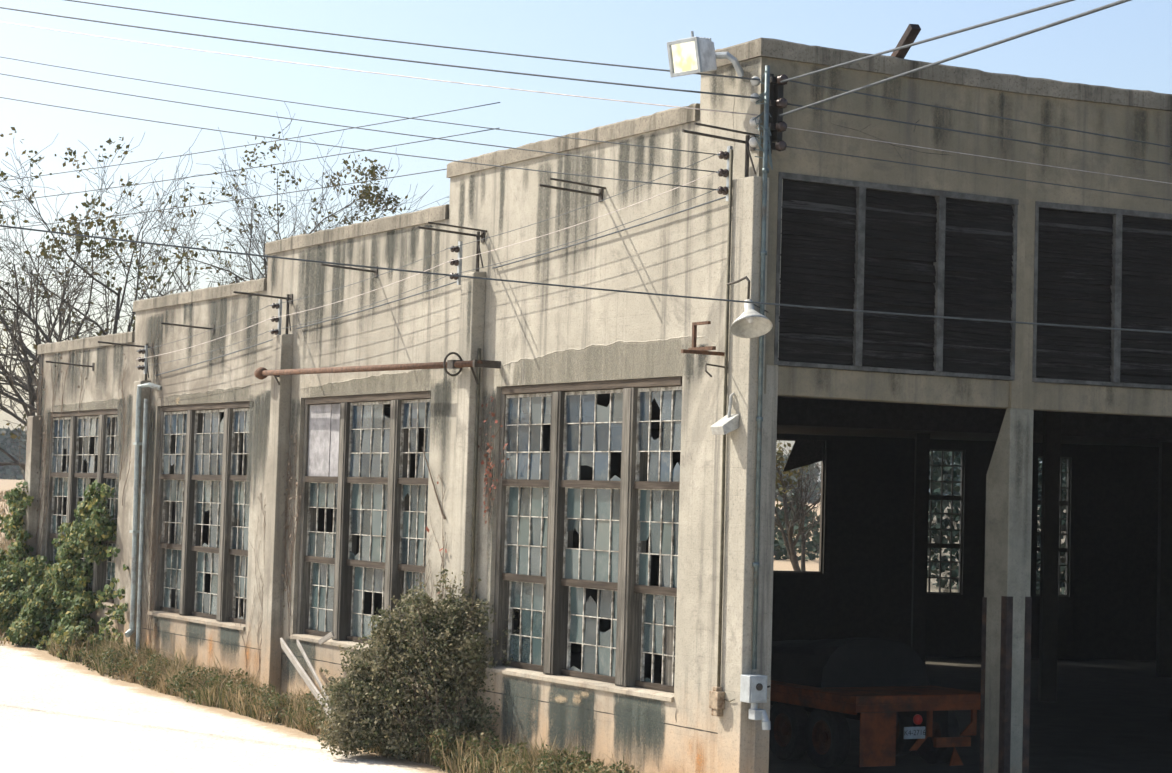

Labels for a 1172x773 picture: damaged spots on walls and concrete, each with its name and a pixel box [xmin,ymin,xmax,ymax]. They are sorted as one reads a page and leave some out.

leakage [459,180,473,240]
leakage [556,158,573,242]
leakage [619,138,643,191]
leakage [672,132,697,203]
leakage [371,226,440,285]
leakage [304,242,352,350]
leakage [501,677,595,753]
leakage [614,694,664,756]